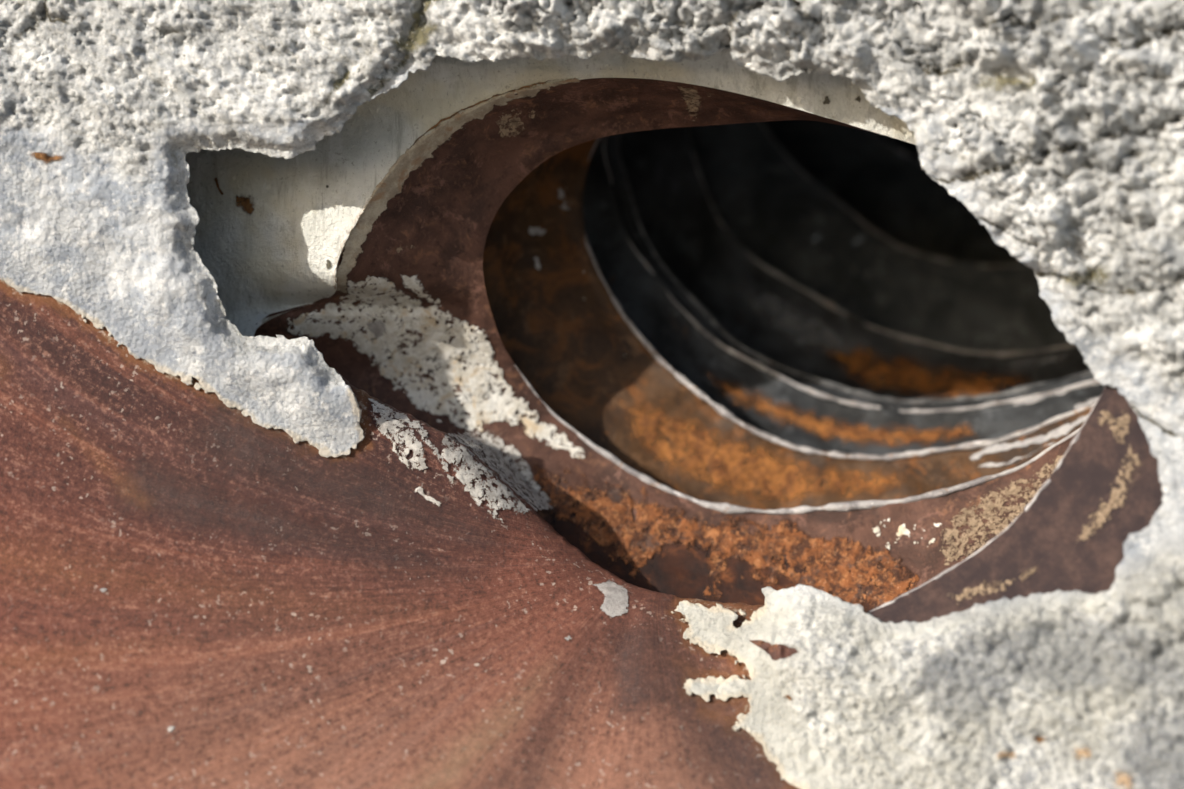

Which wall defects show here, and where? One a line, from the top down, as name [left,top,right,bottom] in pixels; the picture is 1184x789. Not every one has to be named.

corrosion [411,80,549,147]
peeling [496,108,538,137]
peeling [529,227,546,236]
peeling [735,281,869,354]
peeling [287,275,585,523]
corrosion [719,382,969,446]
corrosion [828,348,1017,397]
corrosion [629,409,897,500]
corrosion [533,464,919,613]
peeling [591,580,629,617]
spalling [749,640,799,660]